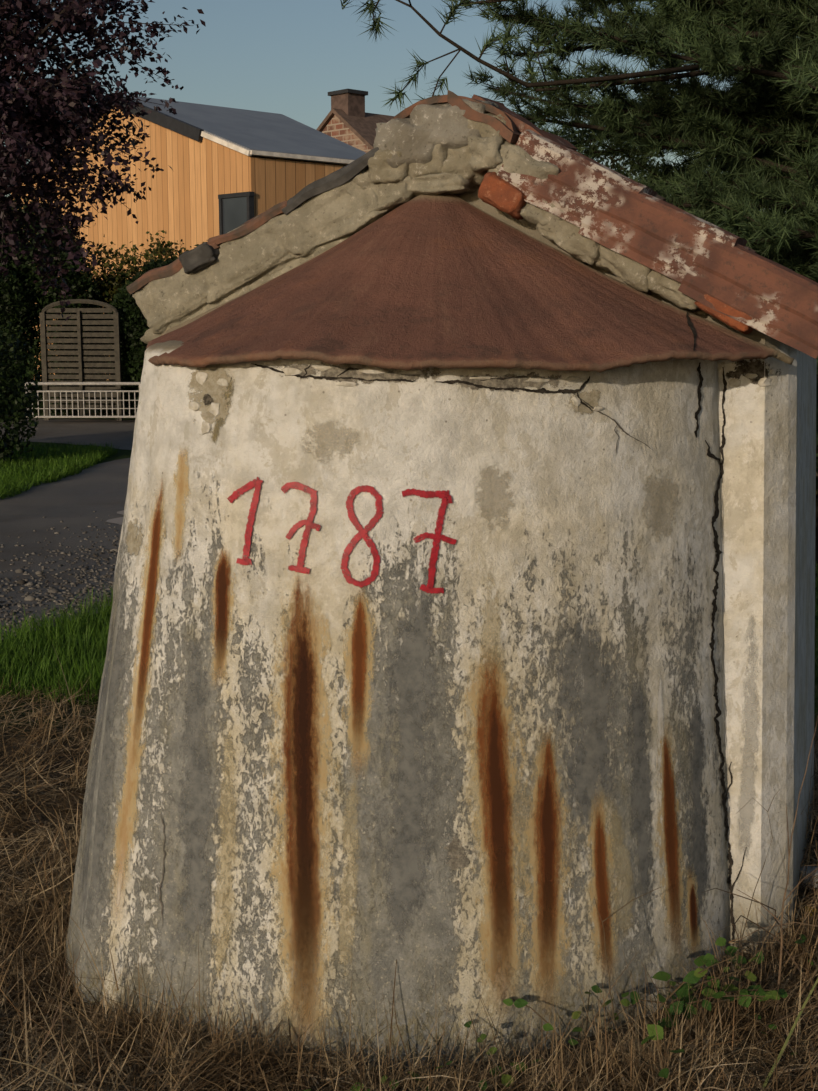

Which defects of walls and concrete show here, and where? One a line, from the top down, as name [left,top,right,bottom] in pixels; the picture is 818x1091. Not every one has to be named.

spalling [447,90,577,151]
spalling [189,364,233,435]
crack [251,363,651,453]
corrosion [115,455,189,875]
corrosion [211,552,234,674]
corrosion [269,585,375,1015]
water stain [378,572,442,943]
corrosion [464,664,571,987]
water stain [550,611,616,832]
water stain [628,672,668,899]
water stain [686,698,709,910]
crack [686,312,747,945]